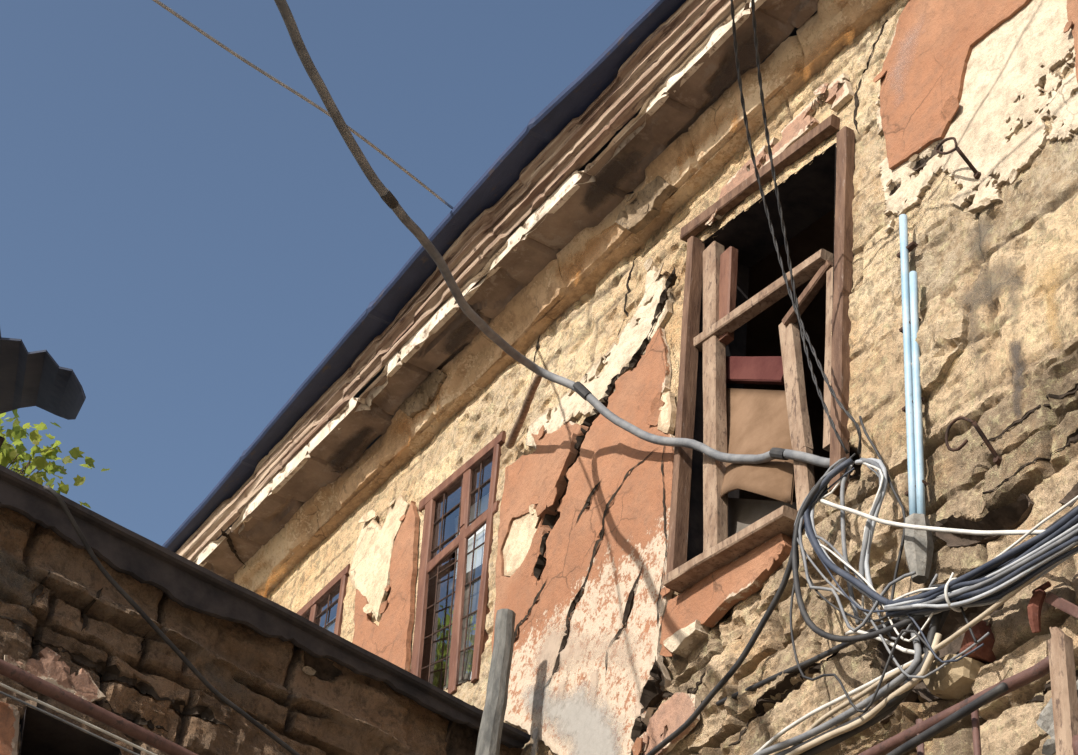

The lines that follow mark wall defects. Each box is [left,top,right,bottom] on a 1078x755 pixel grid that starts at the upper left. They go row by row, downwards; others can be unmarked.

spalling [615,176,678,235]
flaking render [705,73,854,226]
crack [853,20,888,133]
flaking render [873,0,1078,235]
crack [0,570,233,732]
crack [221,529,245,569]
flaking render [349,495,420,672]
crack [514,258,677,689]
flaking render [492,258,792,755]
crack [981,383,1078,446]
crack [982,428,1078,497]
spalling [445,720,479,755]